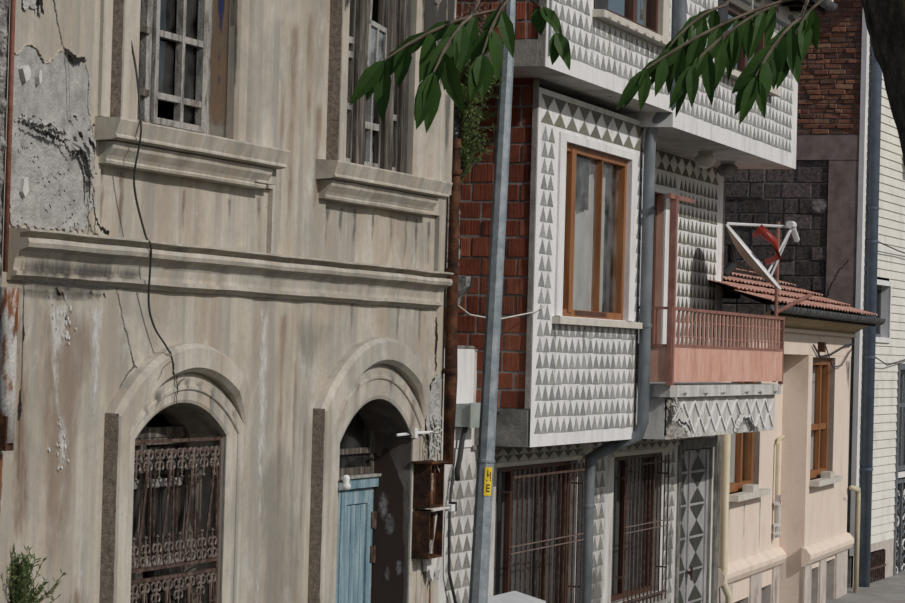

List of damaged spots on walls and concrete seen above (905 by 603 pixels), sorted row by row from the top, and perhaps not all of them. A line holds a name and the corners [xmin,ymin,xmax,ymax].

flaking render [23,0,44,15]
flaking render [10,42,97,232]